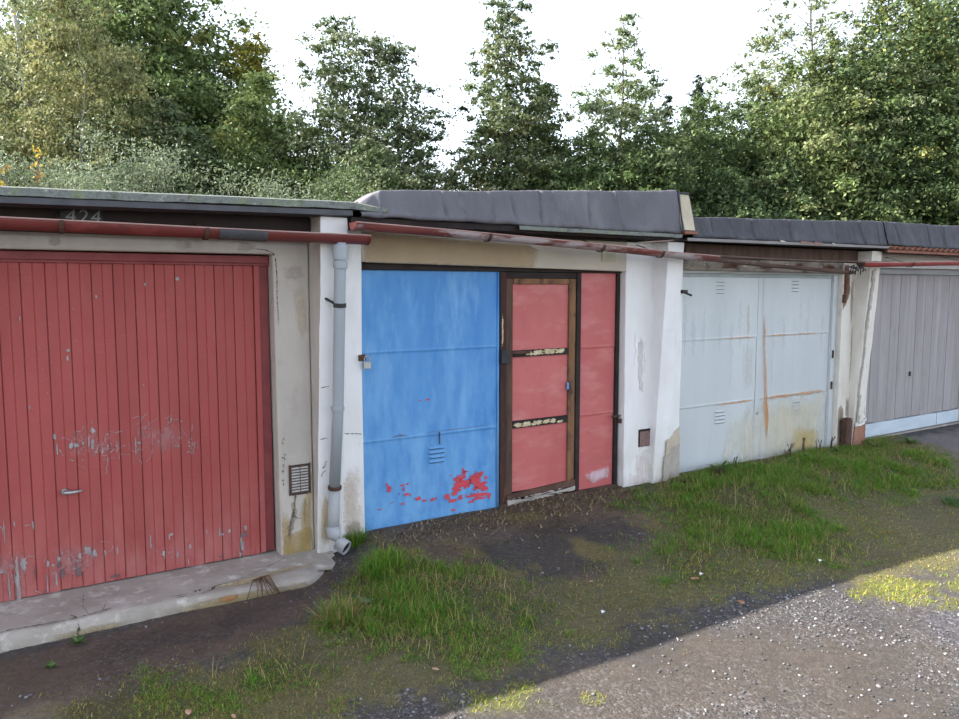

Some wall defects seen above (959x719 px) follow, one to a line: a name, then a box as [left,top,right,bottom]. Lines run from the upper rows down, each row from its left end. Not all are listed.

rust [764,326,820,431]
peeling [53,427,120,461]
peeling [513,418,562,427]
damp [730,401,822,461]
peeling [386,468,491,511]
peeling [0,546,118,600]